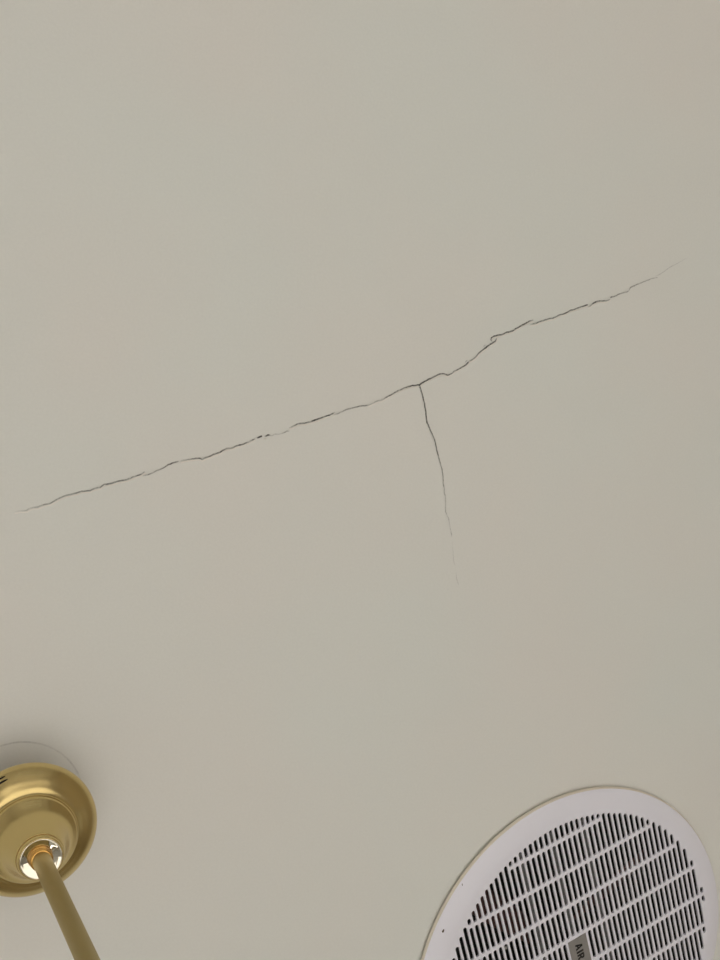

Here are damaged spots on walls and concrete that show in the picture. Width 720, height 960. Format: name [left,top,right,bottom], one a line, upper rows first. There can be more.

crack [15,413,336,514]
crack [358,284,637,473]